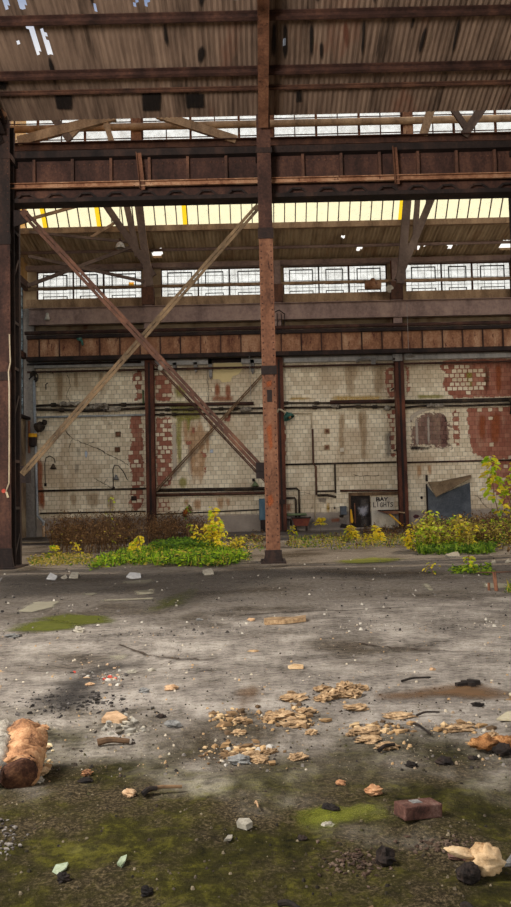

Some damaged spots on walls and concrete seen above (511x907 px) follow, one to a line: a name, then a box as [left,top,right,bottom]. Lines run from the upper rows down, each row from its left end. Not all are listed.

peeling [154,371,173,402]
crack [66,431,128,465]
peeling [128,416,145,511]
peeling [155,417,173,486]
water stain [172,420,192,487]
peeling [410,358,511,509]
peeling [157,498,171,512]